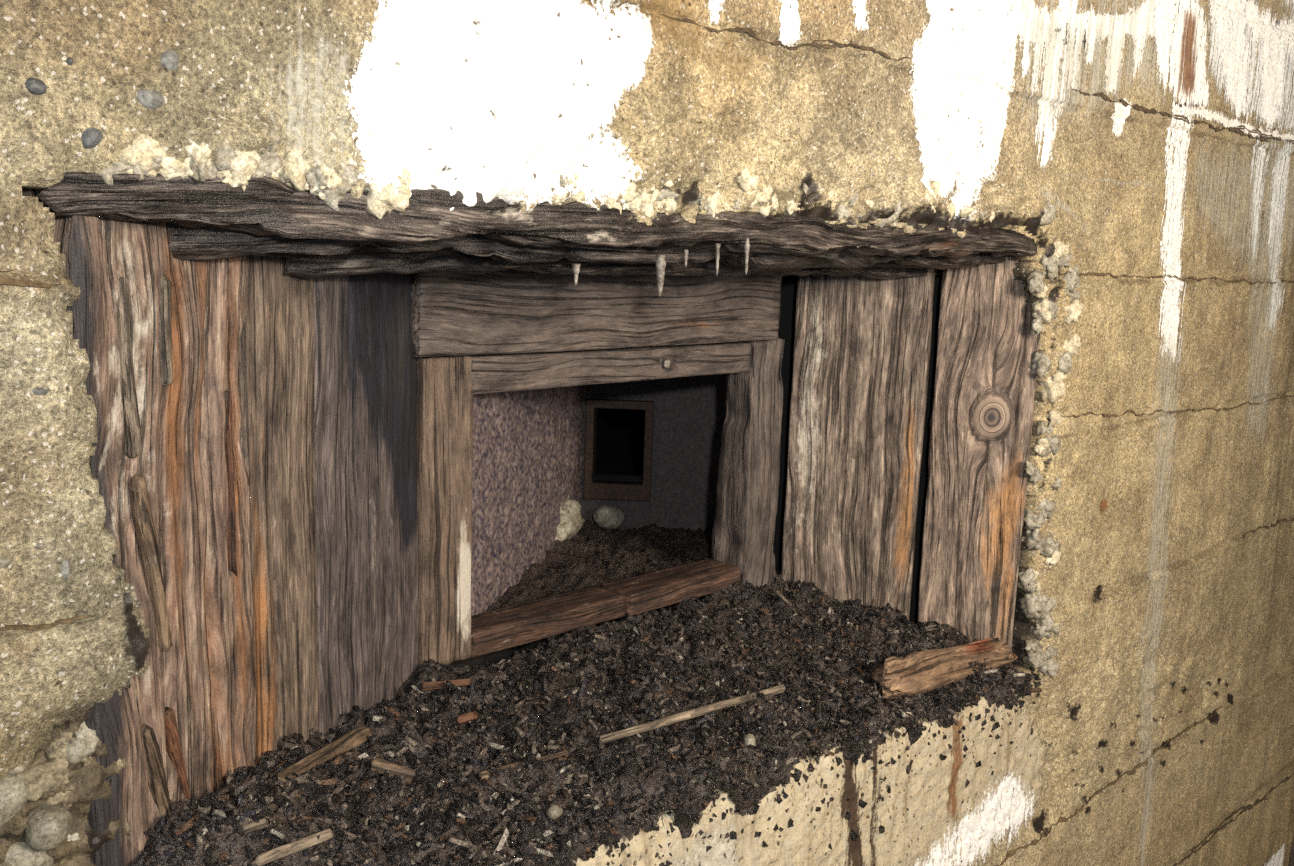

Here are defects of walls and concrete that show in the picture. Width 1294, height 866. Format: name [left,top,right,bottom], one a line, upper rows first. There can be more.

crack [662,14,910,61]
leakage [676,180,702,225]
crack [0,269,60,288]
leakage [769,0,1294,866]
leakage [576,695,1046,866]
crack [995,706,1222,866]
crack [1174,774,1294,866]